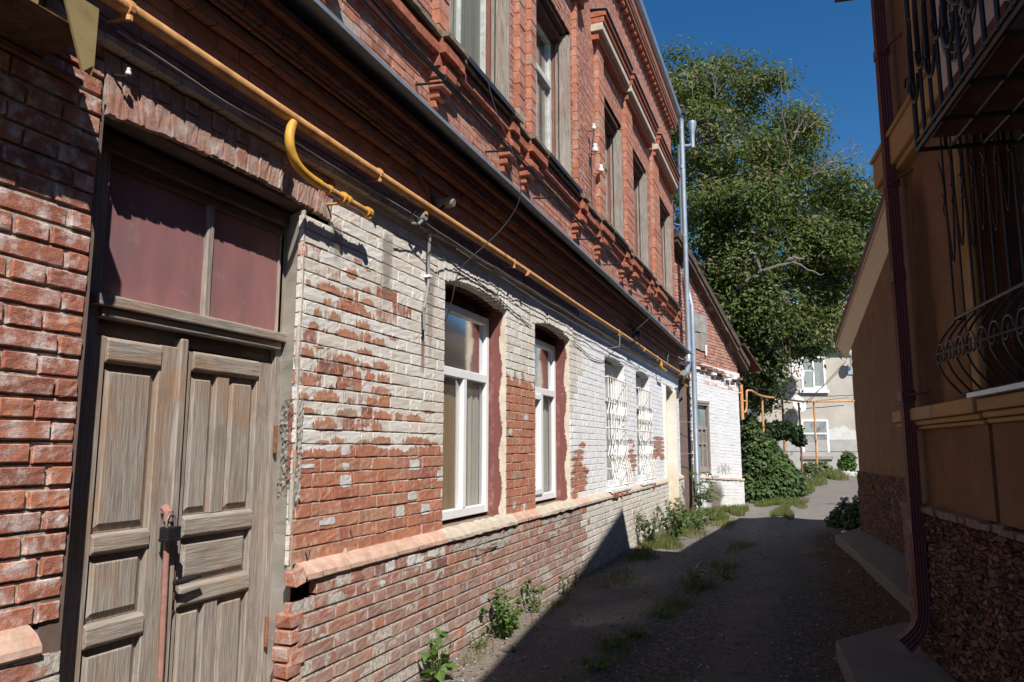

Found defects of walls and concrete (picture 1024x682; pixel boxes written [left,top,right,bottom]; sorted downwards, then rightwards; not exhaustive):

peeling [271,257,443,682]
peeling [506,369,536,514]
peeling [571,441,589,499]
peeling [651,436,665,460]